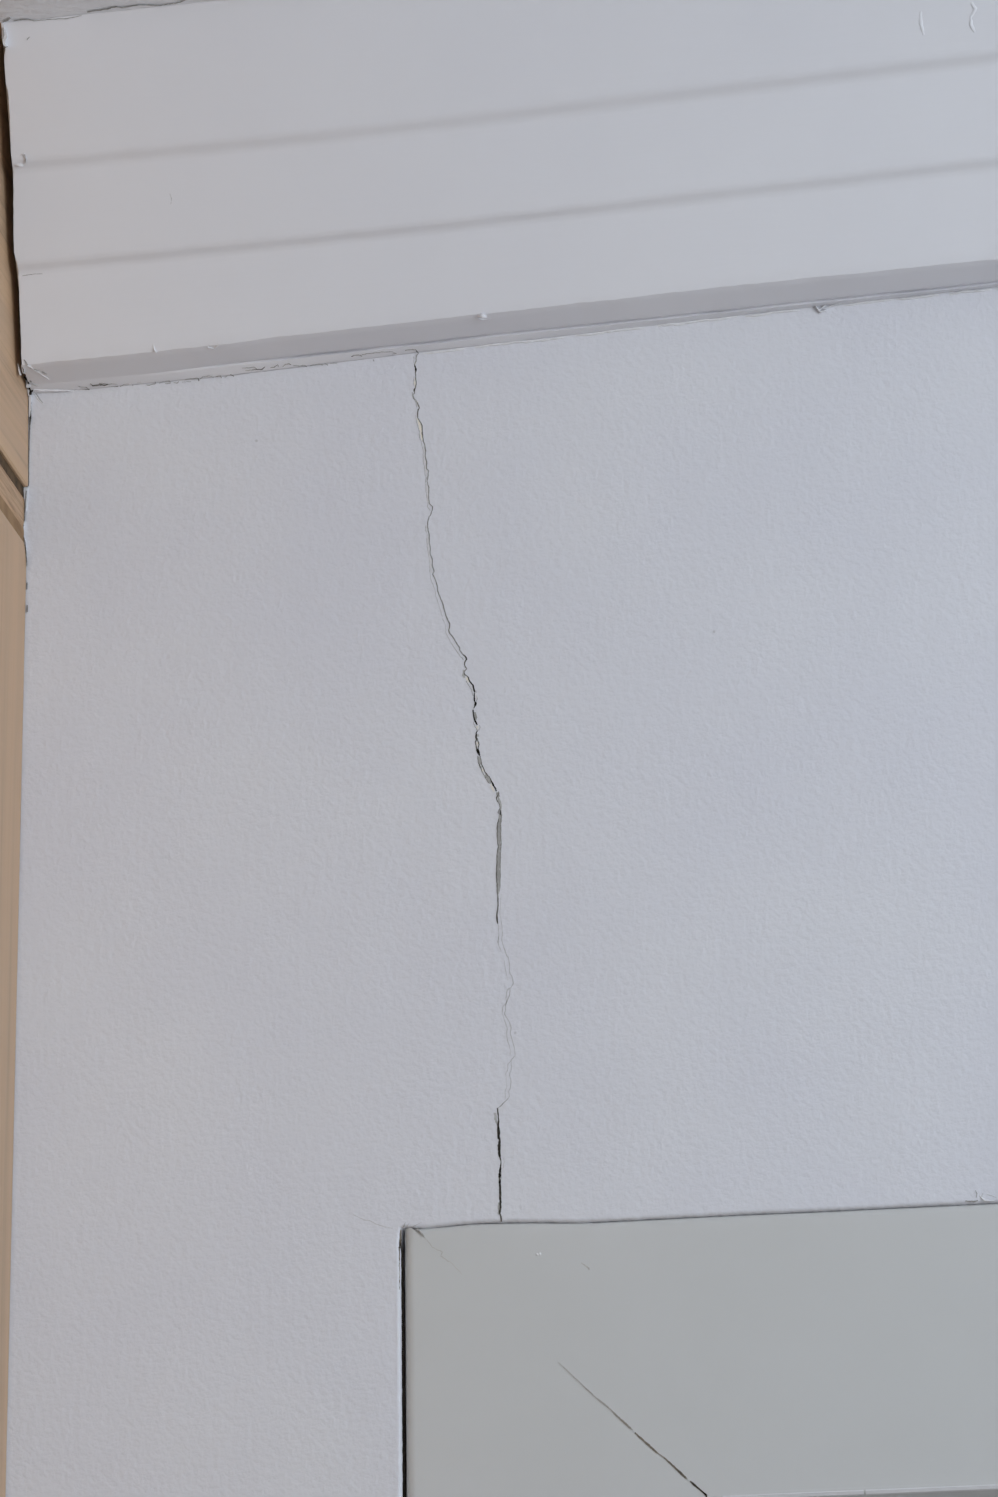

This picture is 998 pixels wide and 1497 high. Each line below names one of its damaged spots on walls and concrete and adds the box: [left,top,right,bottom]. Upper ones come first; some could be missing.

crack [21,349,516,1222]